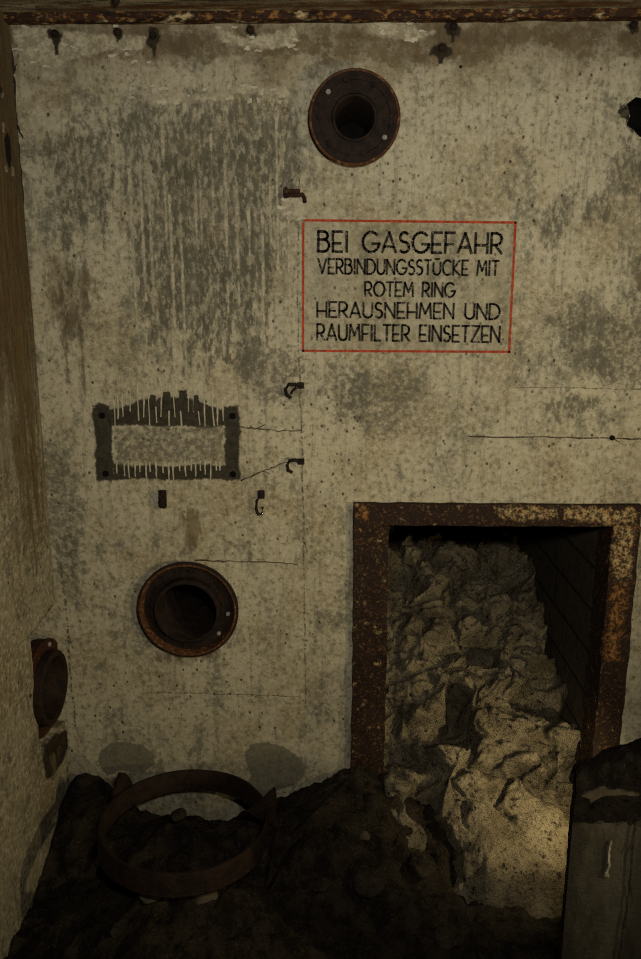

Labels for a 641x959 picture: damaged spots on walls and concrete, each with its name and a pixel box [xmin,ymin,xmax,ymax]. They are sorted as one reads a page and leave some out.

spalling [618,97,641,137]
damp [582,137,641,226]
damp [42,85,310,403]
damp [540,195,569,251]
damp [547,289,641,393]
damp [317,363,427,440]
damp [545,394,599,424]
rust [498,504,636,662]
spalling [575,786,641,810]